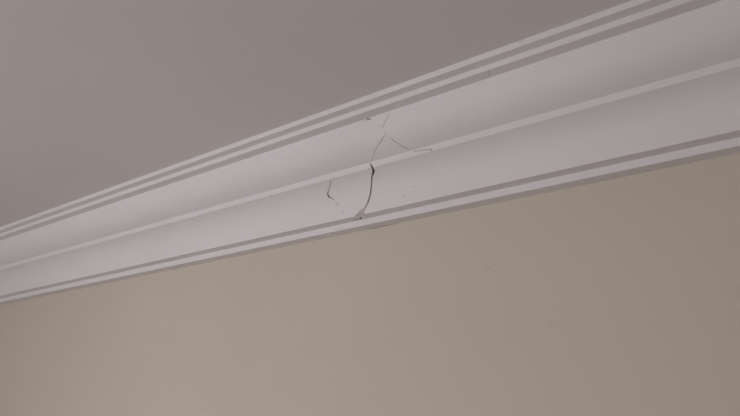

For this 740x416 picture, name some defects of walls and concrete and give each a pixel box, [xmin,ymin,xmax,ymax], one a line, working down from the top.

crack [364,114,390,210]